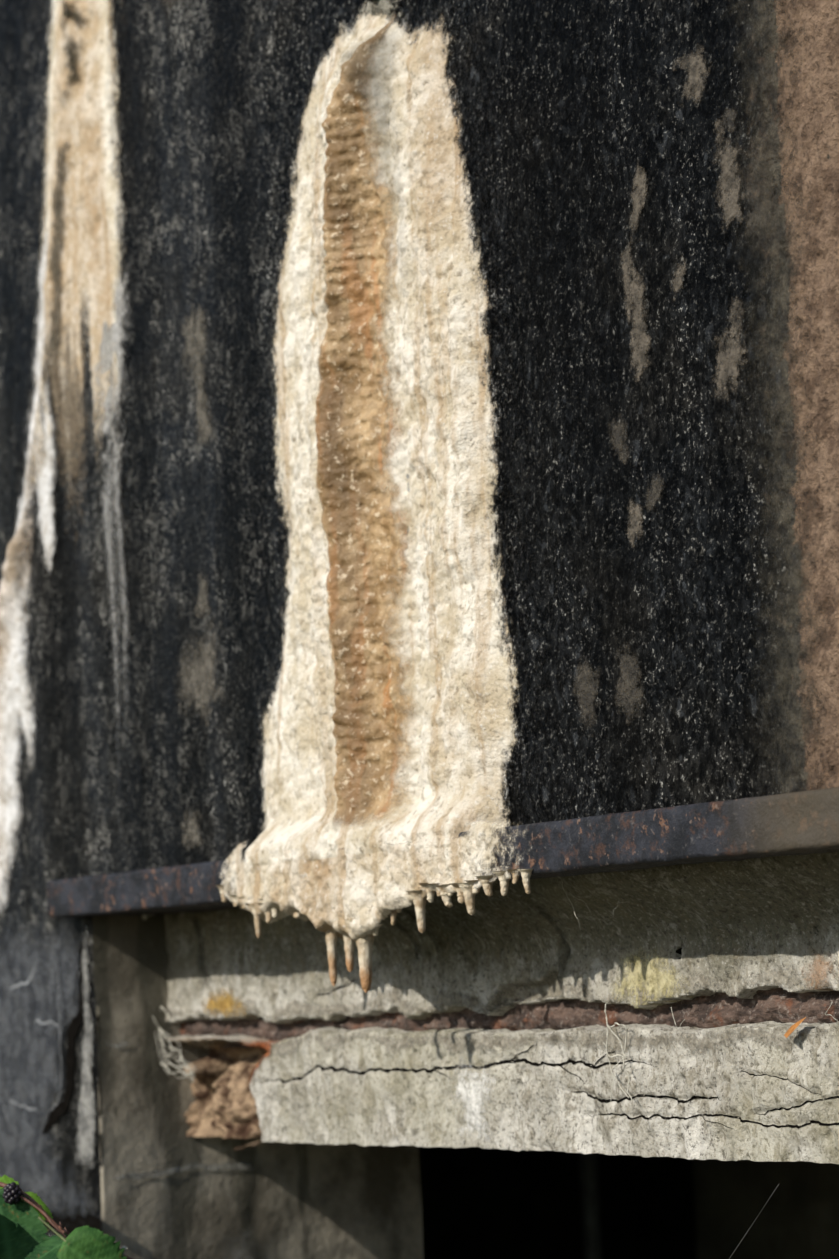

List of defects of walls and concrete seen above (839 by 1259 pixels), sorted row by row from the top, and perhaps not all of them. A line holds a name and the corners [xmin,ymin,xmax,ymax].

crack [360,0,401,18]
damp [0,0,127,906]
damp [215,4,533,993]
spalling [166,972,724,1021]
spalling [184,1027,839,1075]
crack [261,1044,839,1129]